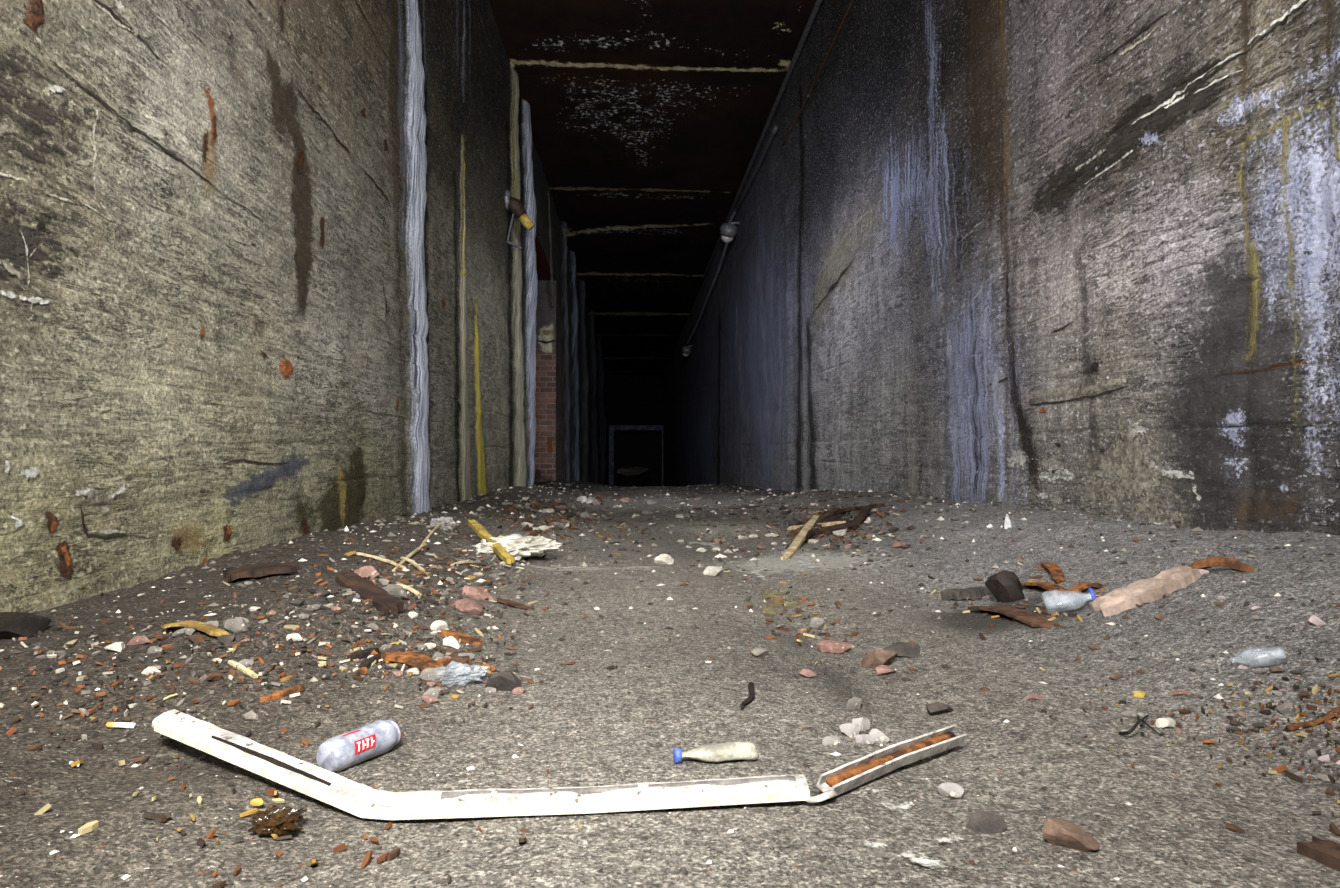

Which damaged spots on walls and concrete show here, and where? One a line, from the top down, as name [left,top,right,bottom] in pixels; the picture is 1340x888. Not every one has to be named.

corrosion [22,0,45,35]
corrosion [201,88,217,163]
corrosion [261,352,293,380]
leakage [266,50,325,315]
leakage [397,0,432,514]
leakage [505,31,791,487]
leakage [1162,47,1340,534]